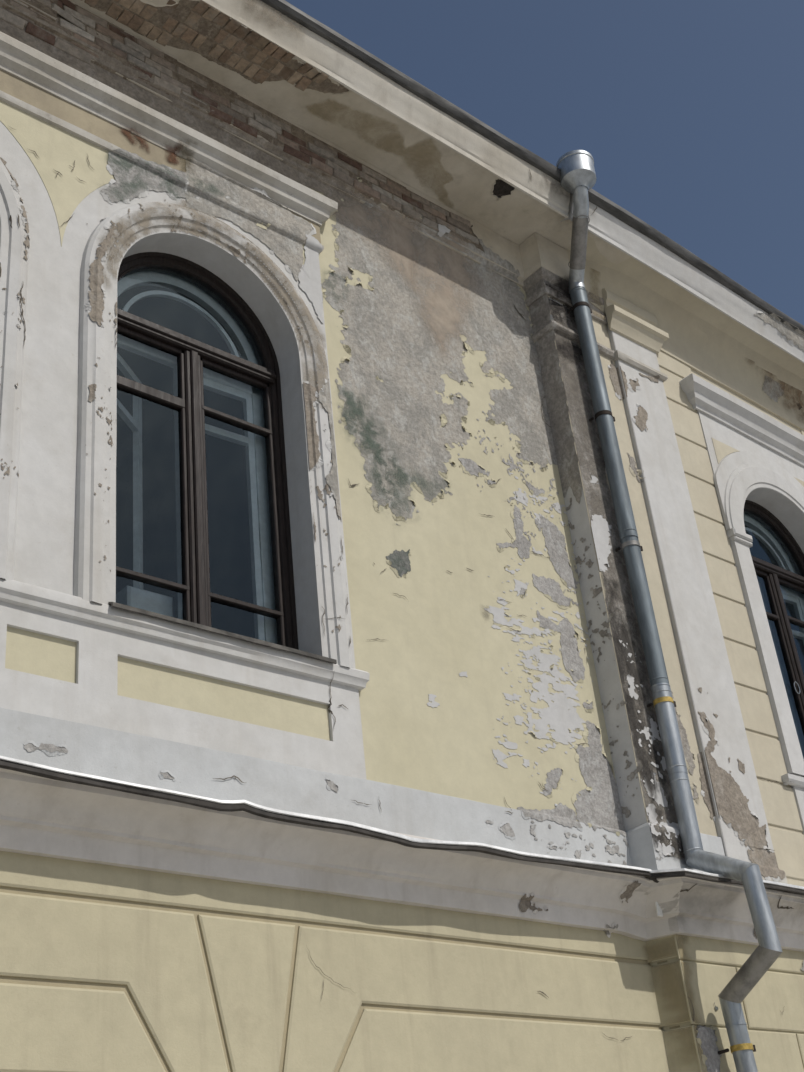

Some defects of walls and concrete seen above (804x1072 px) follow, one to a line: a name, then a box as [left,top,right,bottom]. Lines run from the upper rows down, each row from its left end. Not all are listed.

peeling [0,0,685,865]
water stain [546,278,605,467]
peeling [754,310,804,352]
crack [328,670,348,731]
water stain [607,548,684,859]
peeling [671,691,786,882]